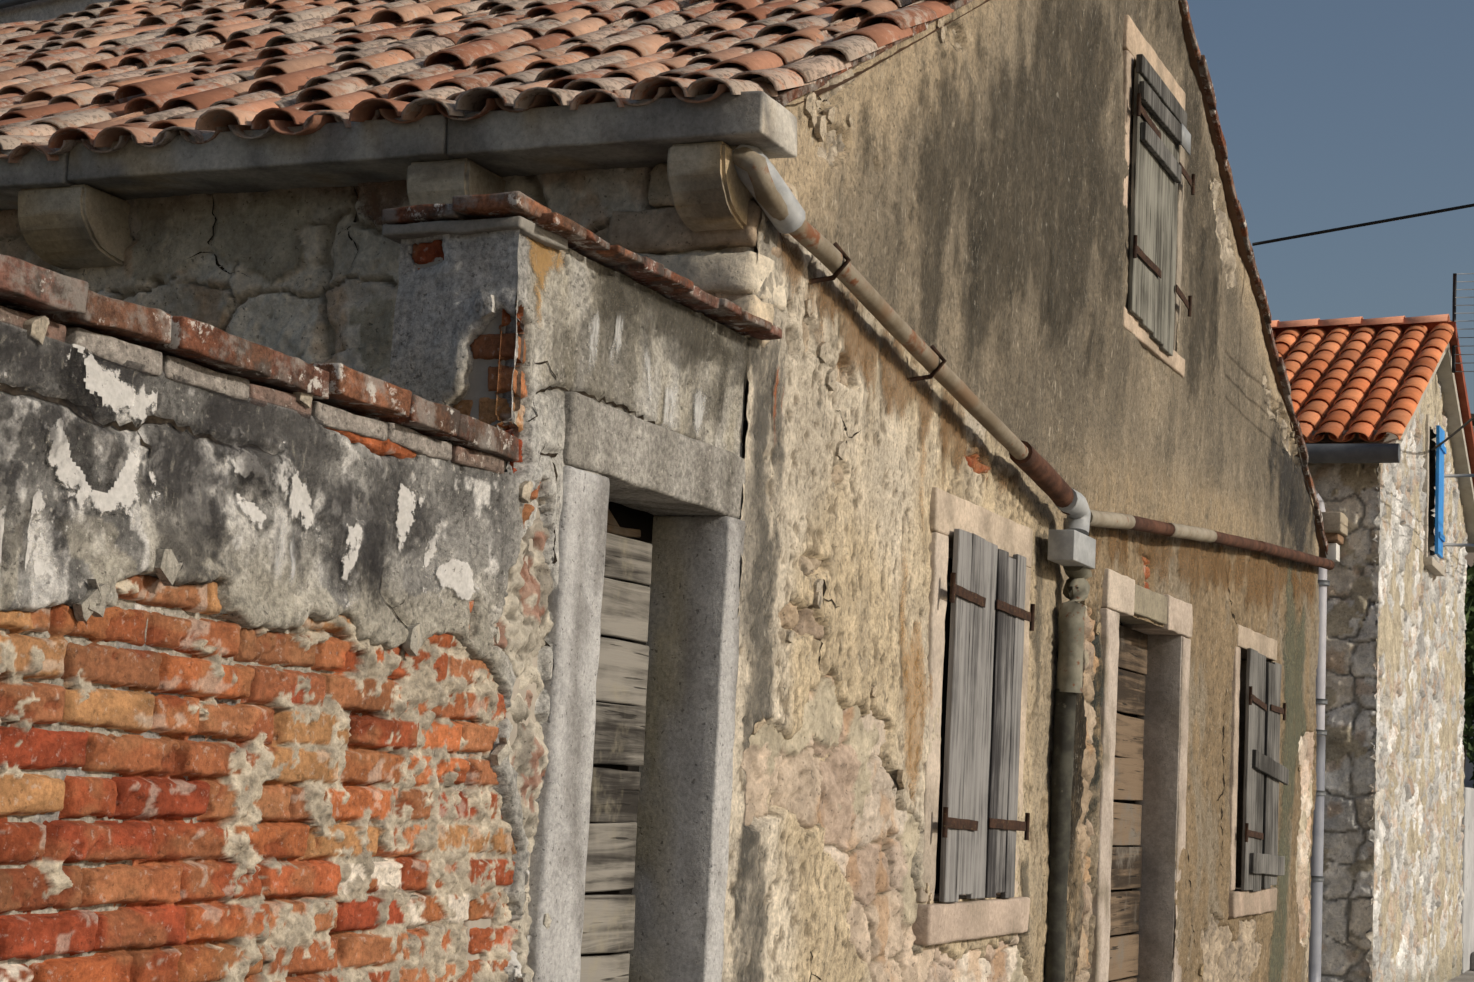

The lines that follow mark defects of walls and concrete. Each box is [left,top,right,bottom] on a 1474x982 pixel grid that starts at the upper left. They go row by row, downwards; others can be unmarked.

corrosion [782,233,1023,488]
leakage [911,0,1124,361]
flaking render [0,290,554,982]
leakage [742,336,785,749]
leakage [733,803,768,982]